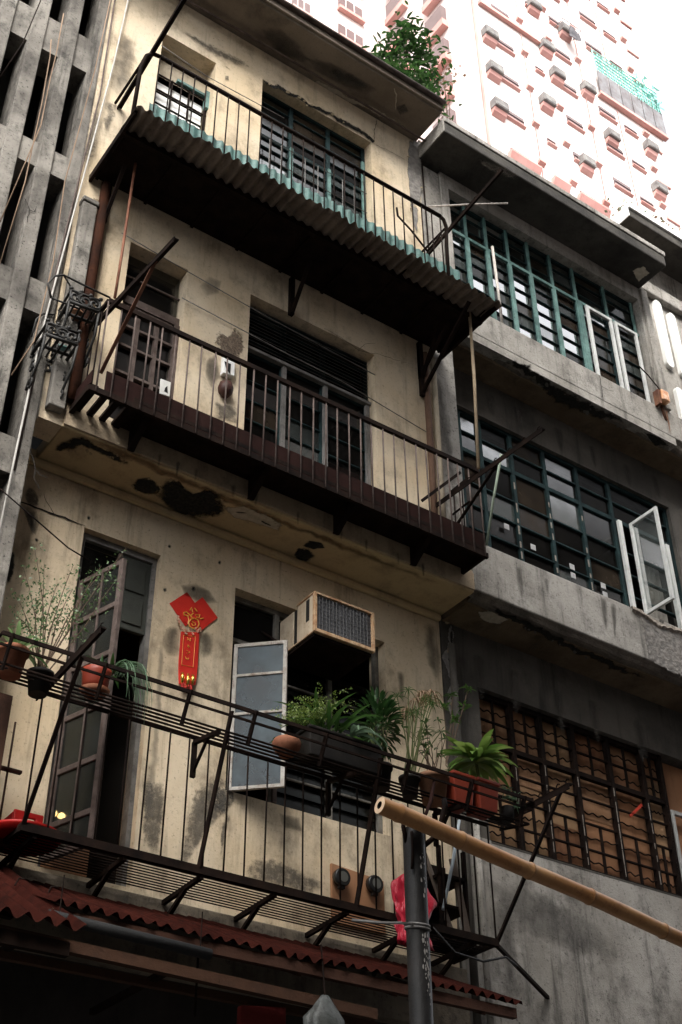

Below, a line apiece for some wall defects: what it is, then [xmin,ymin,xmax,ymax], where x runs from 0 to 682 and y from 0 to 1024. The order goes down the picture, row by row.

flaking render [264,81,375,143]
leakage [102,443,391,566]
leakage [144,783,163,847]
leakage [183,781,233,858]